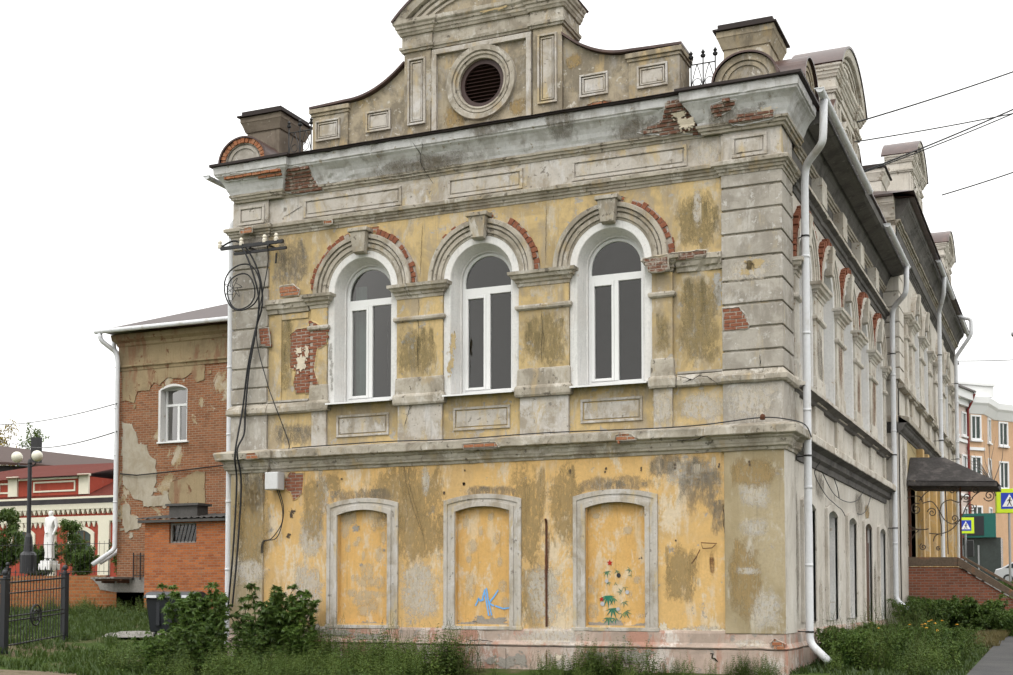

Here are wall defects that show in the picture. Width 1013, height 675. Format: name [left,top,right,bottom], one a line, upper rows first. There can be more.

flaking render [637,98,702,137]
flaking render [709,98,778,126]
flaking render [221,138,264,163]
flaking render [222,165,324,195]
leakage [679,192,717,247]
leakage [680,279,718,358]
flaking render [712,273,750,331]
flaking render [289,320,333,395]
peeling [118,422,206,539]
leakage [652,457,724,529]
leakage [471,466,644,644]
leakage [665,547,697,600]